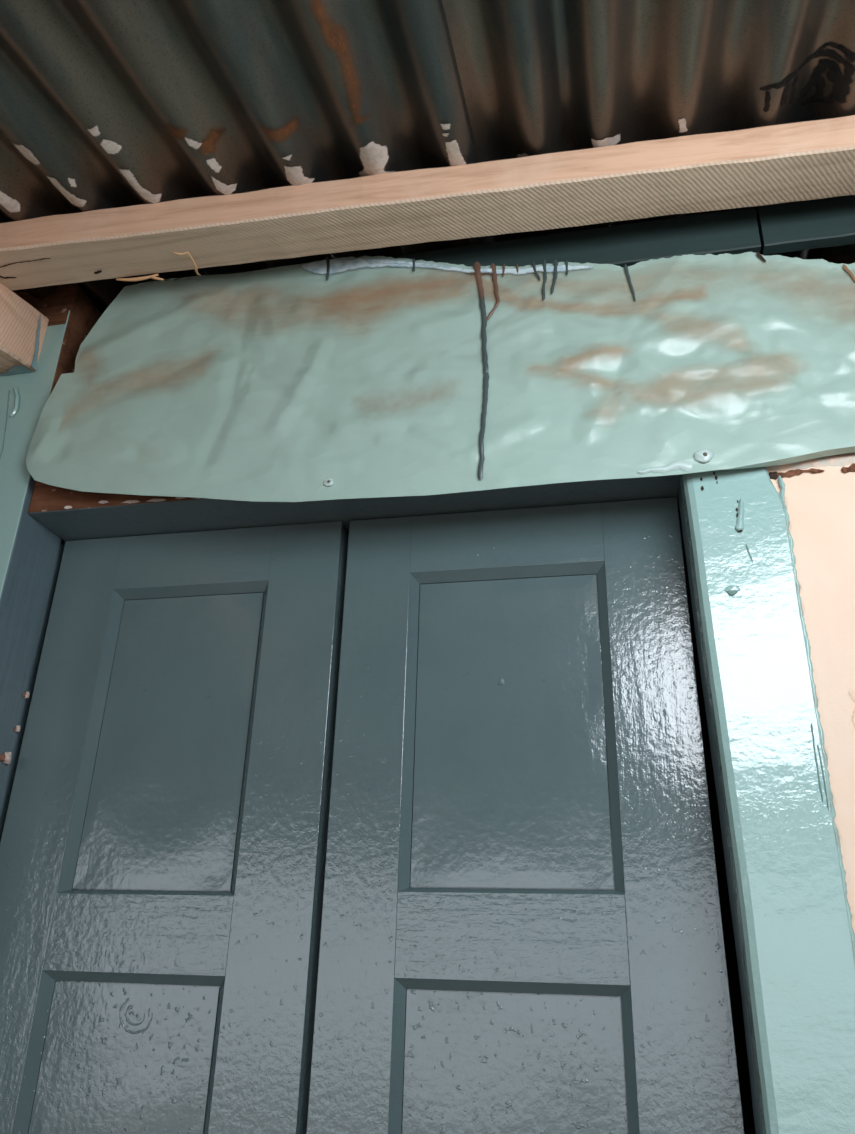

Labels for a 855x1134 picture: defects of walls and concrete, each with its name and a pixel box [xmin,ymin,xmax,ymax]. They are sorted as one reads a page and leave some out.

corrosion [312,0,368,124]
peeling [0,191,21,212]
peeling [13,143,40,165]
peeling [46,176,87,207]
peeling [87,126,122,154]
peeling [119,169,162,204]
peeling [206,158,237,195]
peeling [283,155,314,186]
peeling [359,141,395,177]
peeling [440,124,466,166]
damp [624,264,636,301]
damp [474,259,568,479]